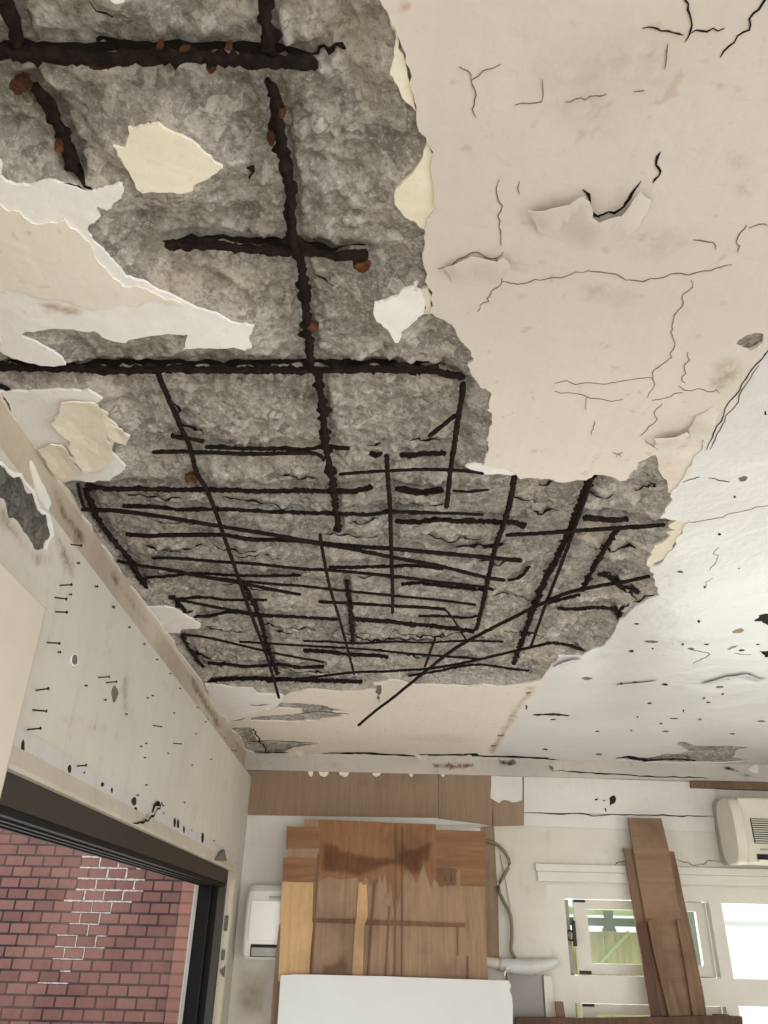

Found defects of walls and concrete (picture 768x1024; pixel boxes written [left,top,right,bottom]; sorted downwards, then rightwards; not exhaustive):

crack [643,0,766,67]
crack [460,64,501,117]
crack [516,90,607,105]
crack [583,152,662,218]
crack [439,181,768,450]
spalling [737,333,763,348]
spalling [0,0,720,753]
crack [247,705,707,779]
spalling [624,733,758,774]
crack [133,801,165,824]
crack [524,810,706,818]